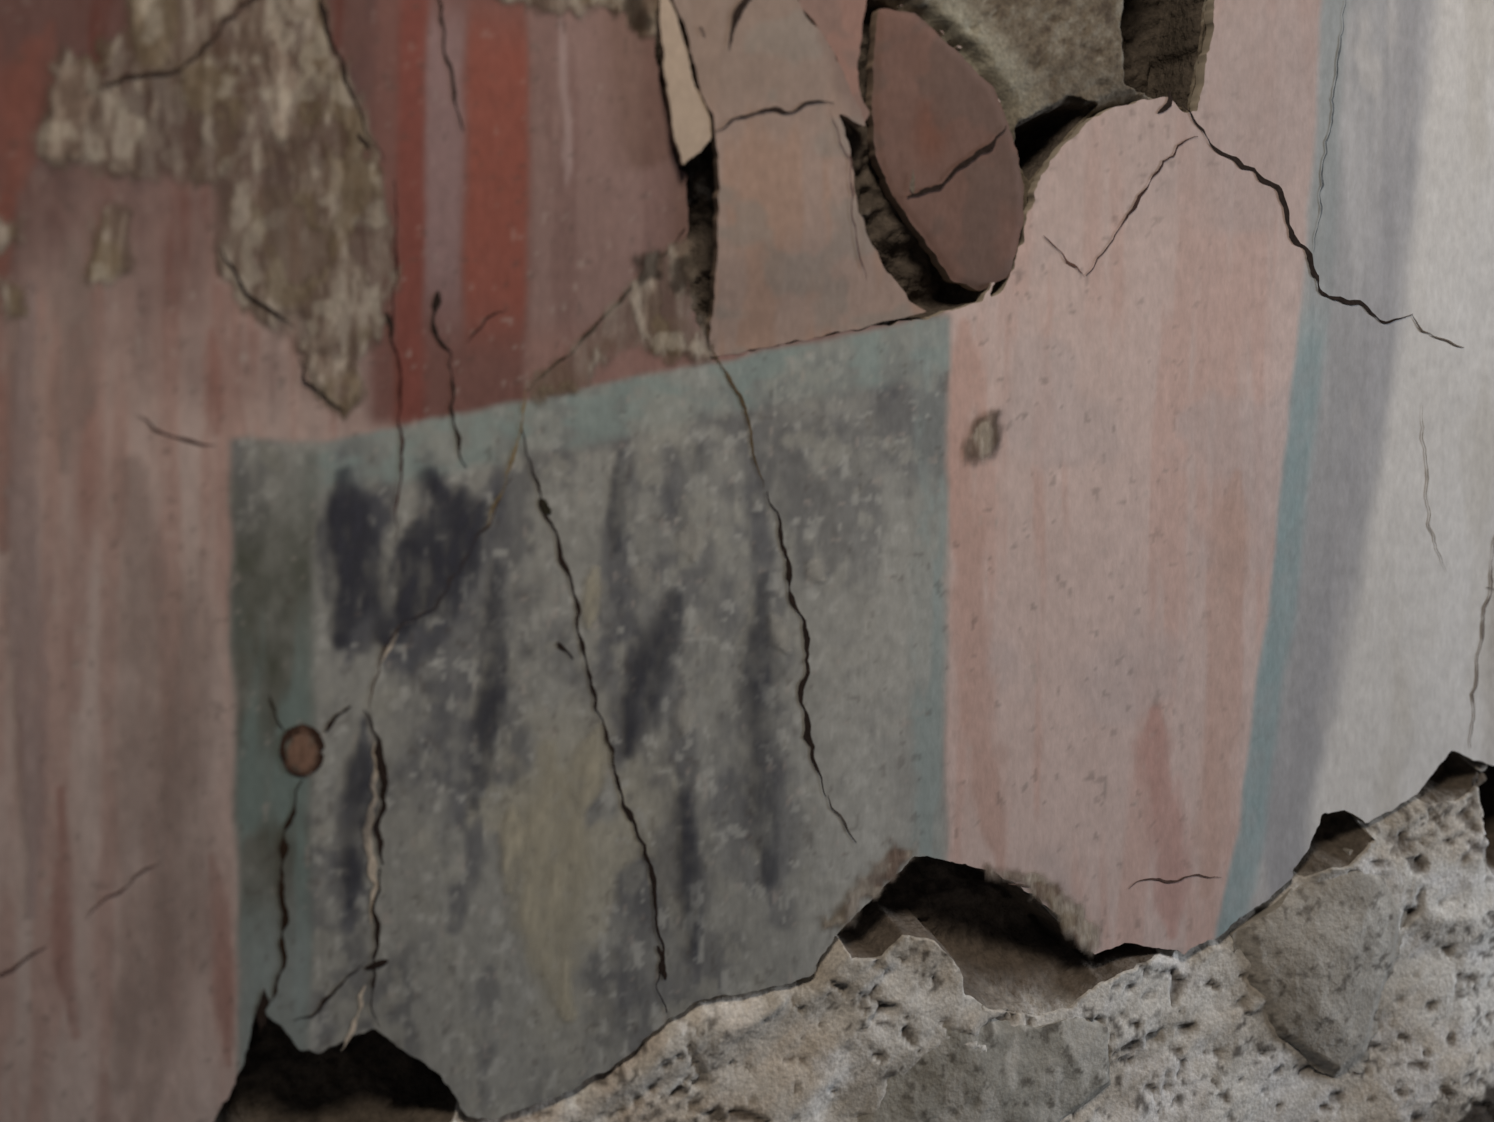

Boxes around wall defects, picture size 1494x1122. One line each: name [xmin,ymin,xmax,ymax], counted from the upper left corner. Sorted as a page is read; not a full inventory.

peeling [38,0,399,418]
crack [318,0,404,541]
peeling [502,0,712,165]
spalling [1120,0,1204,112]
crack [1043,4,1464,348]
crack [431,228,686,1012]
crack [707,329,857,843]
crack [1470,543,1494,748]
crack [256,625,401,1048]
peeling [824,845,912,929]
peeling [985,865,1100,952]
spalling [1472,765,1494,876]